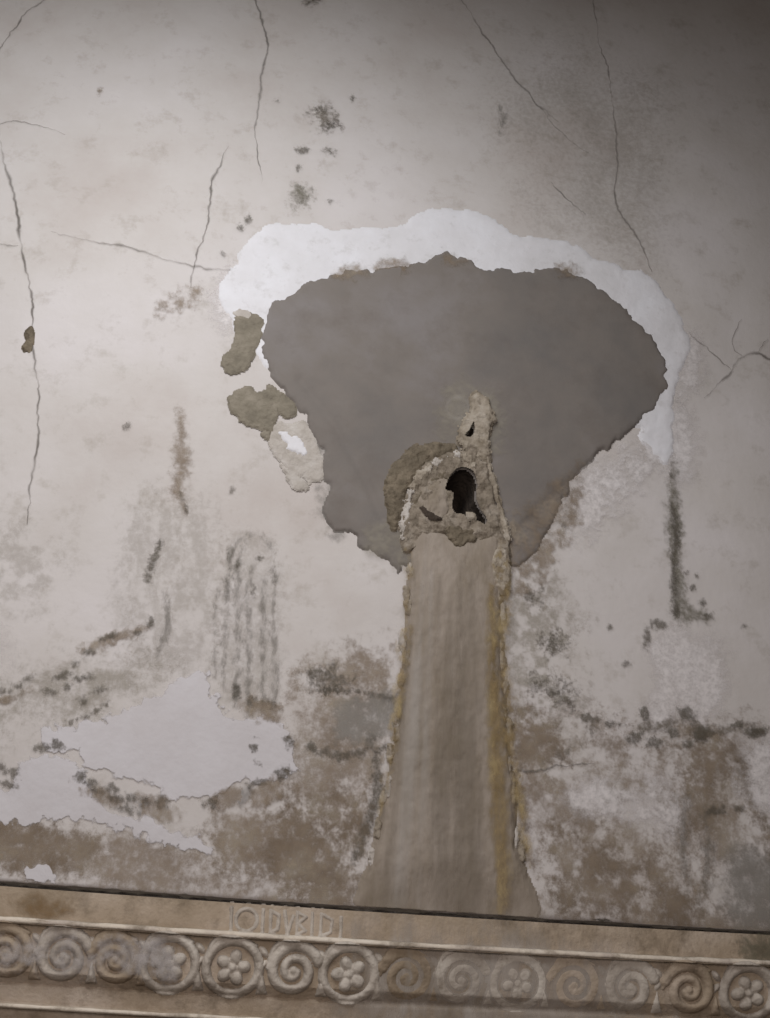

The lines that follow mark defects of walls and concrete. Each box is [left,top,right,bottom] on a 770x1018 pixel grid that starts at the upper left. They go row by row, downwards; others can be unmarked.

crack [10,179,34,317]
peeling [221,309,265,375]
water stain [173,417,188,512]
peeling [227,384,324,492]
spalling [383,390,512,595]
peeling [83,617,154,654]
peeling [0,670,299,855]
water stain [0,533,770,960]
peeling [24,864,56,884]